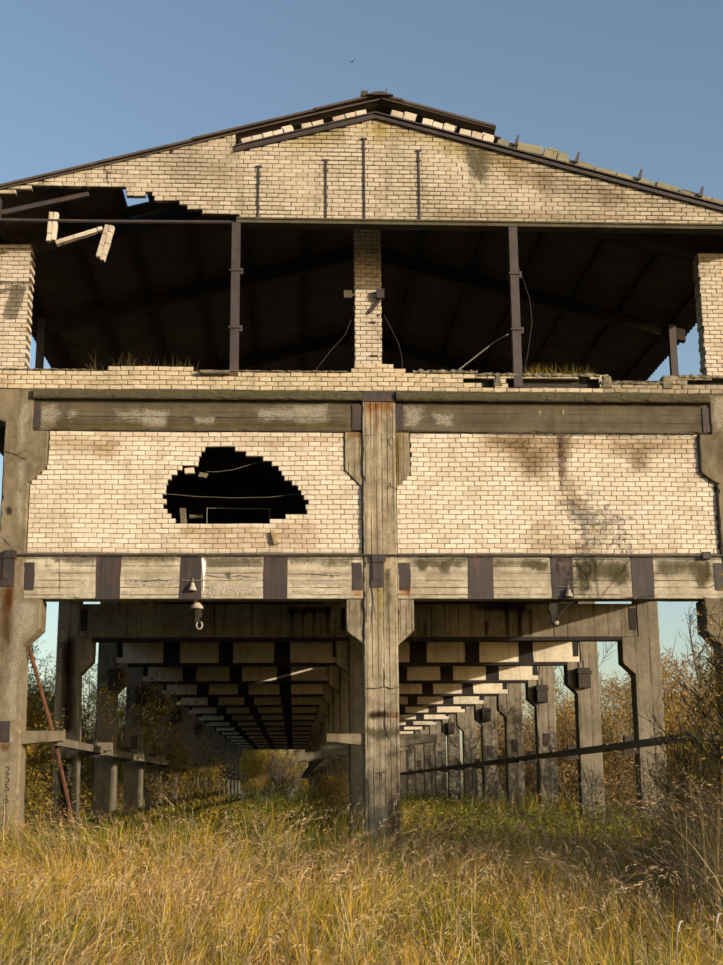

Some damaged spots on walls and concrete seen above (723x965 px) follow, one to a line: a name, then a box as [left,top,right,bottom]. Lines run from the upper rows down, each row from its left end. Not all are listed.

leakage [465,147,491,181]
leakage [528,561,547,571]
leakage [577,561,595,591]
leakage [609,565,628,583]